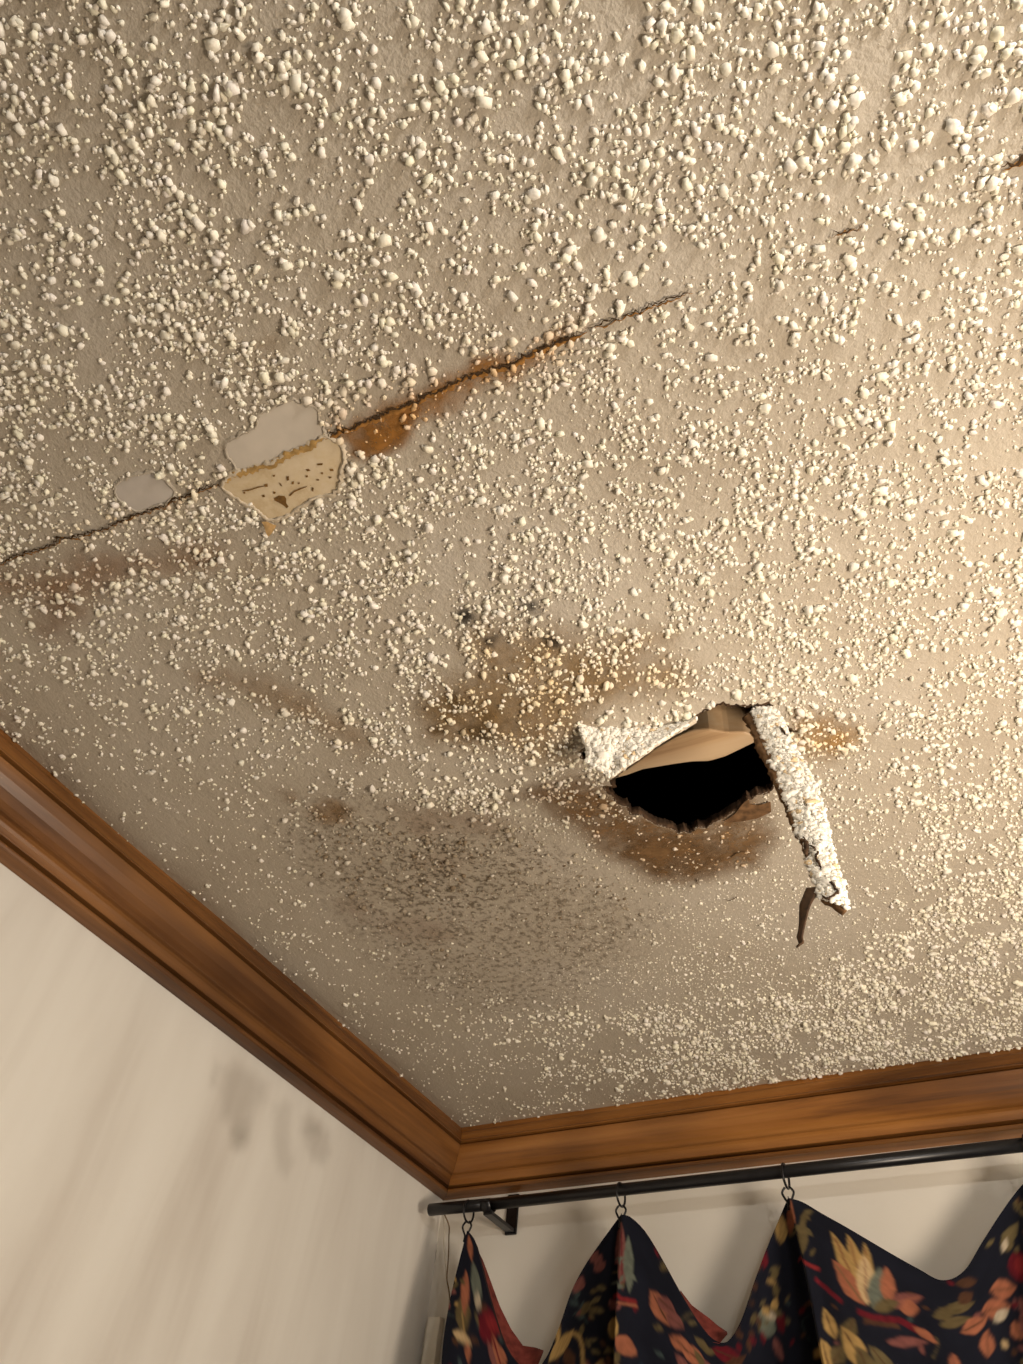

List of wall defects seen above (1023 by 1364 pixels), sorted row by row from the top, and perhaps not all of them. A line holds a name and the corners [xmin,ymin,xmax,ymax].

crack [1001,155,1023,171]
crack [829,225,862,239]
rust [344,359,502,454]
crack [328,291,693,438]
peeling [0,0,1023,816]
crack [0,484,220,566]
damp [433,638,631,748]
peeling [387,261,1023,1126]
damp [809,724,849,750]
damp [533,783,768,879]
peeling [190,849,373,978]
peeling [337,957,396,1034]